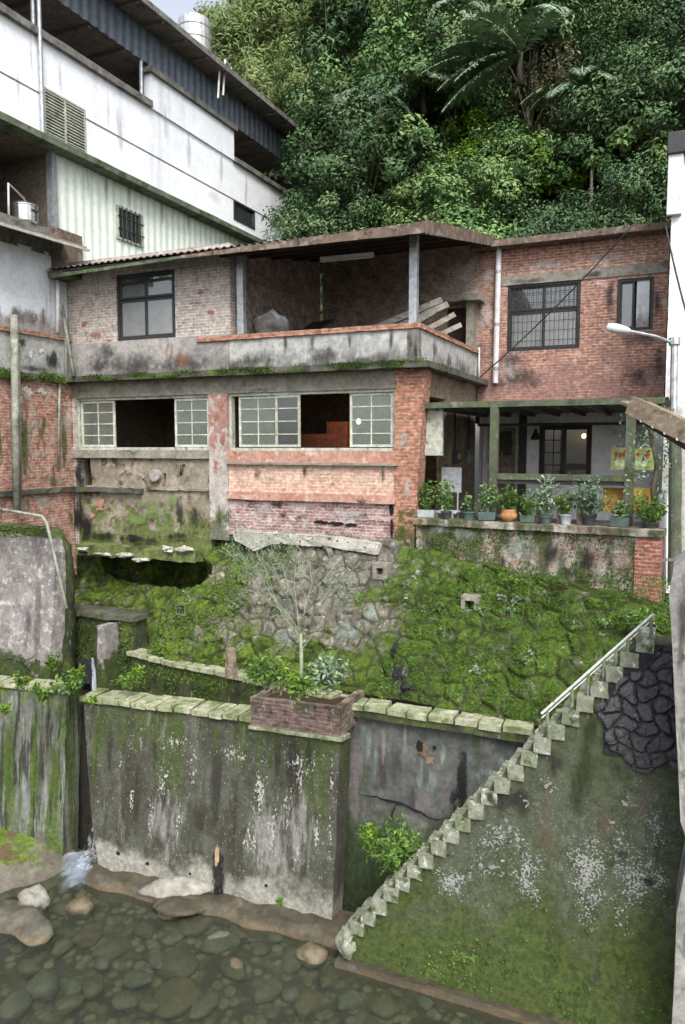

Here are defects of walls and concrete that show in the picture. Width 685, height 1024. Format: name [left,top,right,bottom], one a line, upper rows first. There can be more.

leakage [74,463,198,543]
peeling [77,547,150,562]
peeling [162,545,194,553]
leakage [546,542,592,576]
leakage [1,717,59,809]
leakage [197,728,221,831]
leakage [450,751,467,813]
crack [358,793,465,820]
leakage [210,851,224,895]